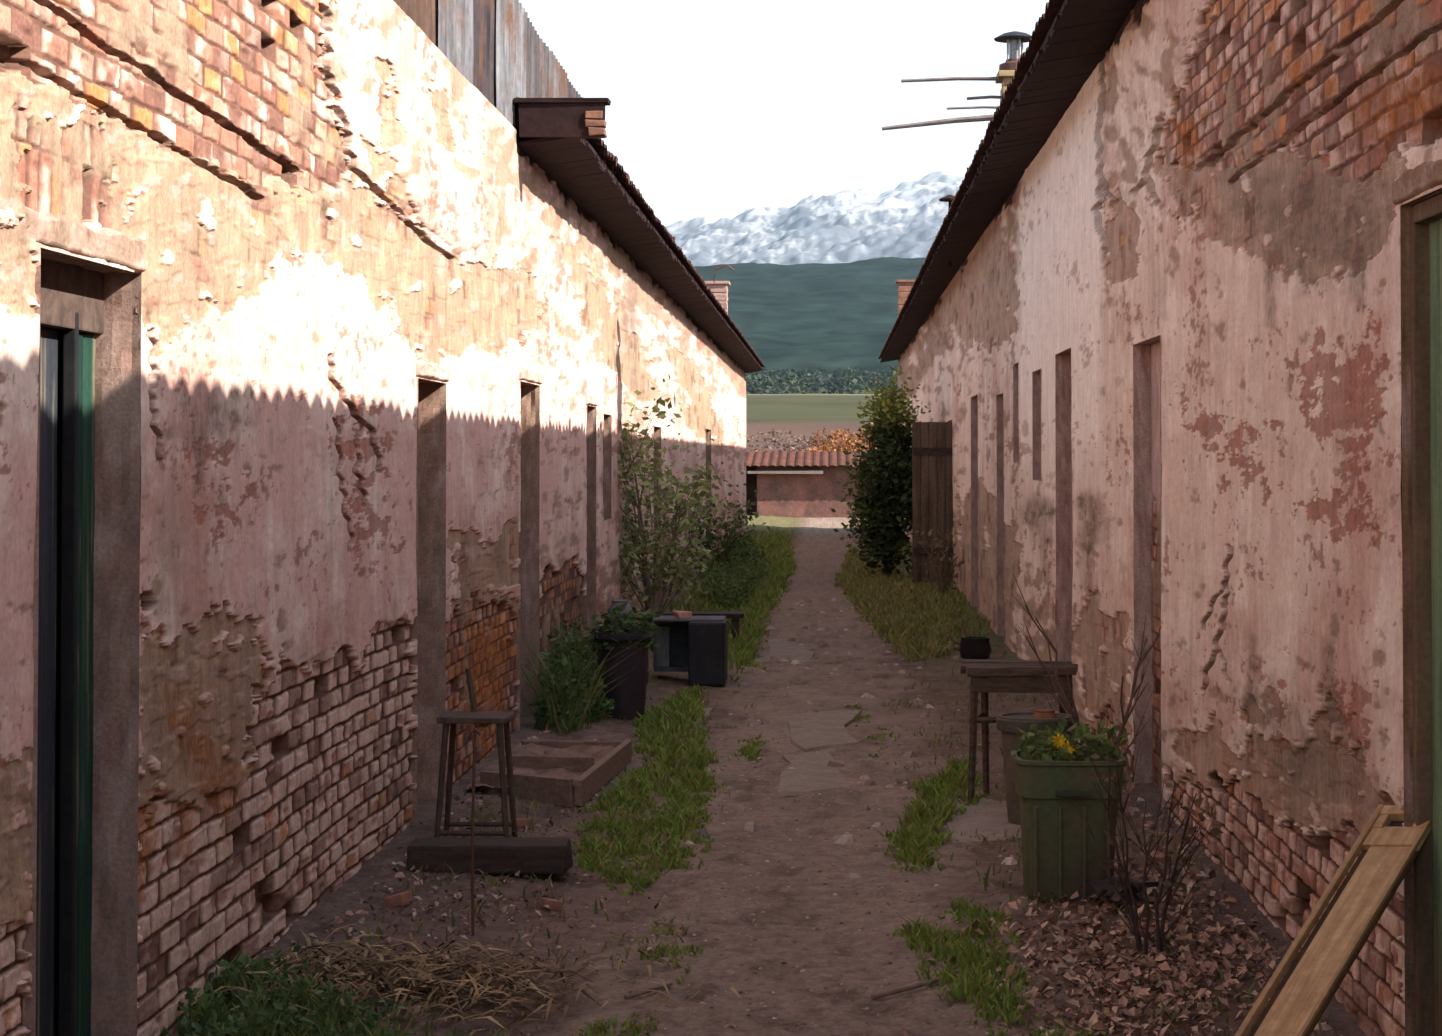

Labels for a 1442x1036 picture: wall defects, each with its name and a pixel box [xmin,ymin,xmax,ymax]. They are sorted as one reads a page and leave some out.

flaking render [0,0,548,364]
flaking render [1105,187,1141,283]
flaking render [1152,0,1442,287]
crack [326,352,382,553]
peeling [1181,382,1282,507]
peeling [1284,317,1395,551]
flaking render [439,519,520,794]
crack [1201,543,1234,696]
flaking render [0,746,33,1036]
flaking render [124,591,416,1036]
flaking render [1165,678,1409,952]
flaking render [1335,893,1409,1036]